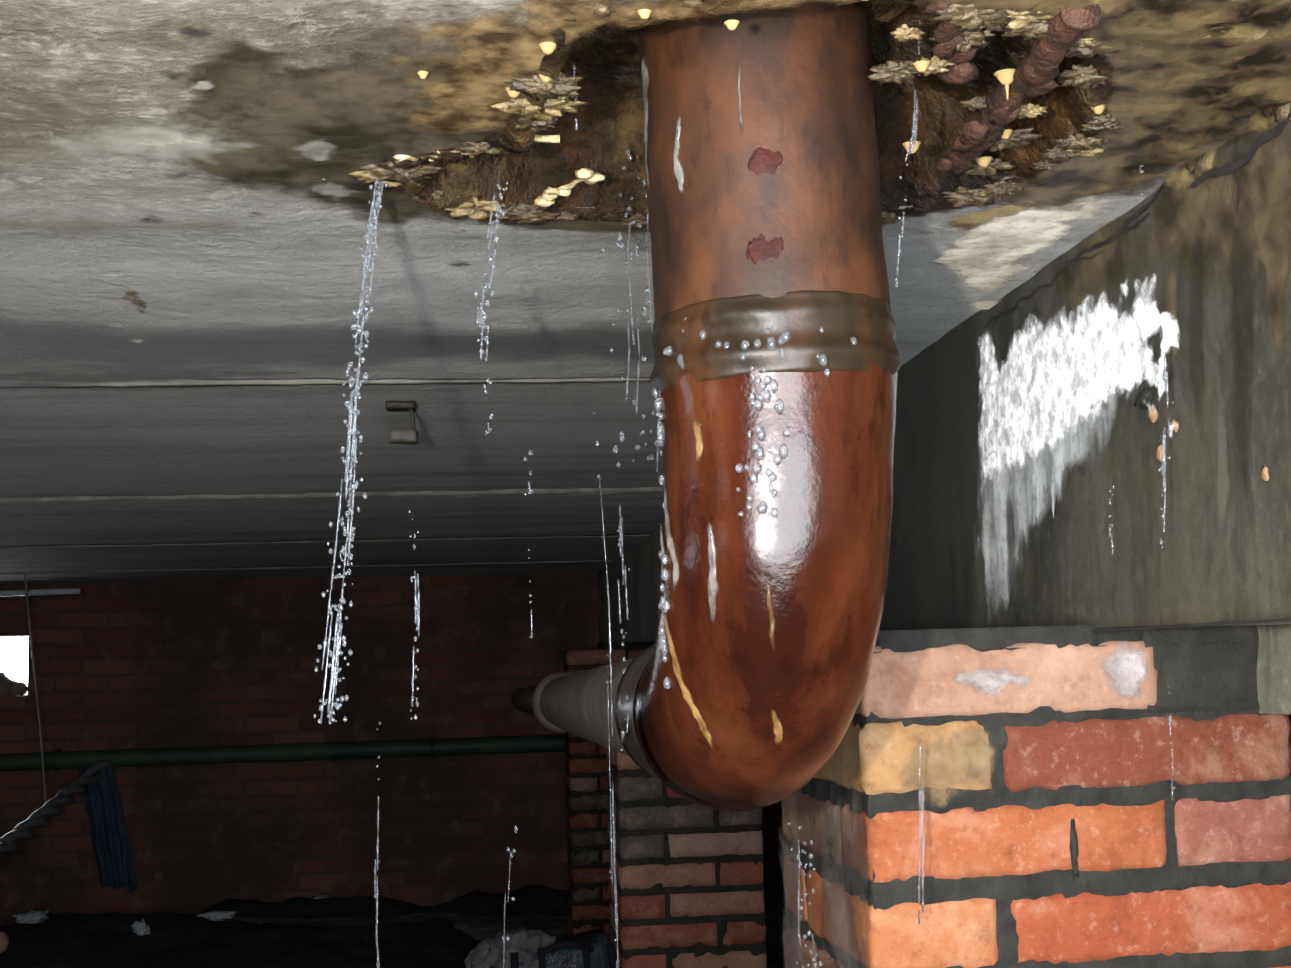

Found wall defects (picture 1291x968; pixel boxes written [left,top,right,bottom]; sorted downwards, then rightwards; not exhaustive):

damp [173,29,501,224]
rust [396,0,692,133]
damp [533,135,560,143]
damp [478,168,650,234]
damp [563,0,612,22]
damp [674,118,683,191]
spalling [348,0,1140,309]
rust [908,0,979,87]
rust [933,3,1101,174]
damp [925,0,1291,209]
damp [978,277,1179,606]